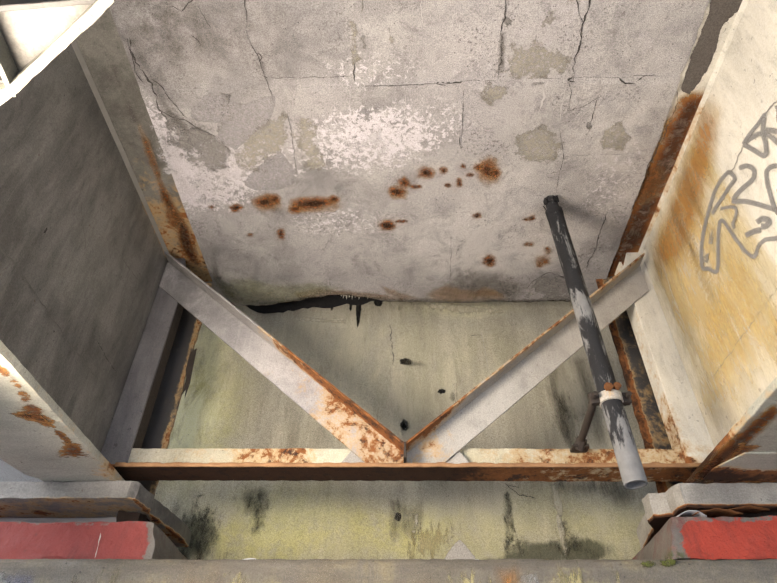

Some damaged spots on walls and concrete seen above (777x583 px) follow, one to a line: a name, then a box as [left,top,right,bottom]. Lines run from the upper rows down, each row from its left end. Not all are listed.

crack [127,37,217,138]
crack [244,0,349,100]
crack [378,0,515,144]
crack [538,0,601,191]
rust [143,137,200,265]
rust [289,196,339,213]
rust [389,159,500,197]
crack [606,75,680,273]
rust [607,93,737,331]
leakage [341,295,417,327]
rust [0,366,88,458]
rust [642,406,777,484]